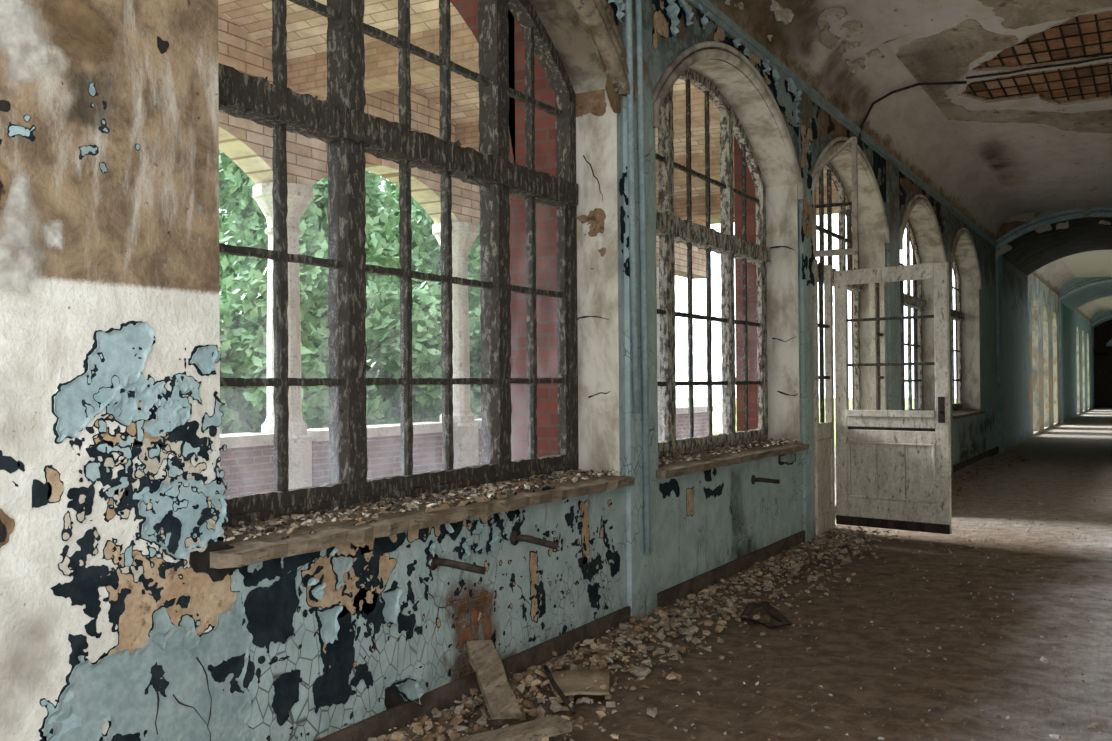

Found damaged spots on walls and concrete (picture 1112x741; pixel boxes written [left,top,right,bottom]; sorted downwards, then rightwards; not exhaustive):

leakage [0,0,116,78]
peeling [576,27,621,117]
leakage [741,0,818,53]
peeling [817,0,1112,134]
peeling [0,100,36,145]
peeling [79,83,110,173]
leakage [0,177,36,292]
leakage [44,222,62,248]
peeling [577,155,606,257]
peeling [619,166,630,277]
peeling [658,438,801,517]
peeling [0,320,620,741]